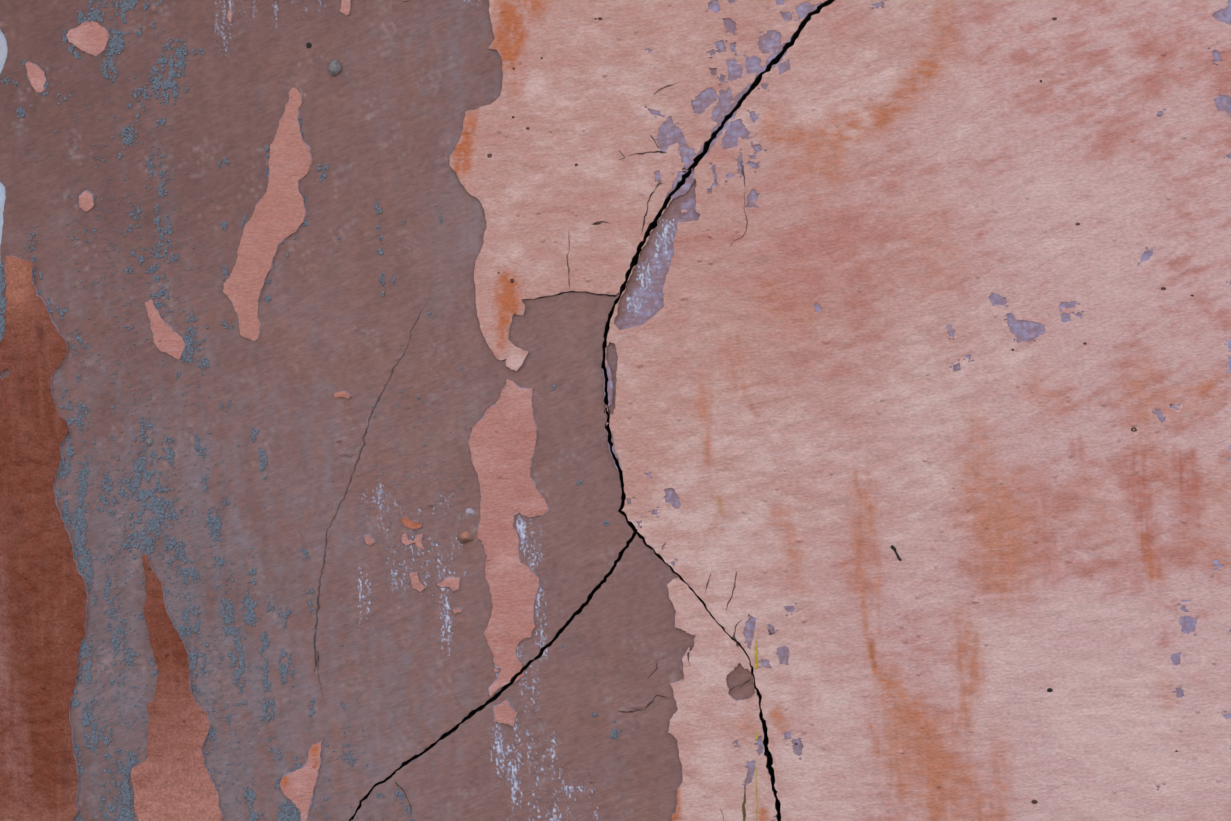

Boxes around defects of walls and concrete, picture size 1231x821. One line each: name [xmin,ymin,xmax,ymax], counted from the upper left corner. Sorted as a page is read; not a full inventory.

peeling [1212,0,1231,25]
peeling [1214,95,1231,116]
peeling [988,293,1045,351]
peeling [1059,301,1084,322]
peeling [0,0,829,821]
crack [349,0,835,821]